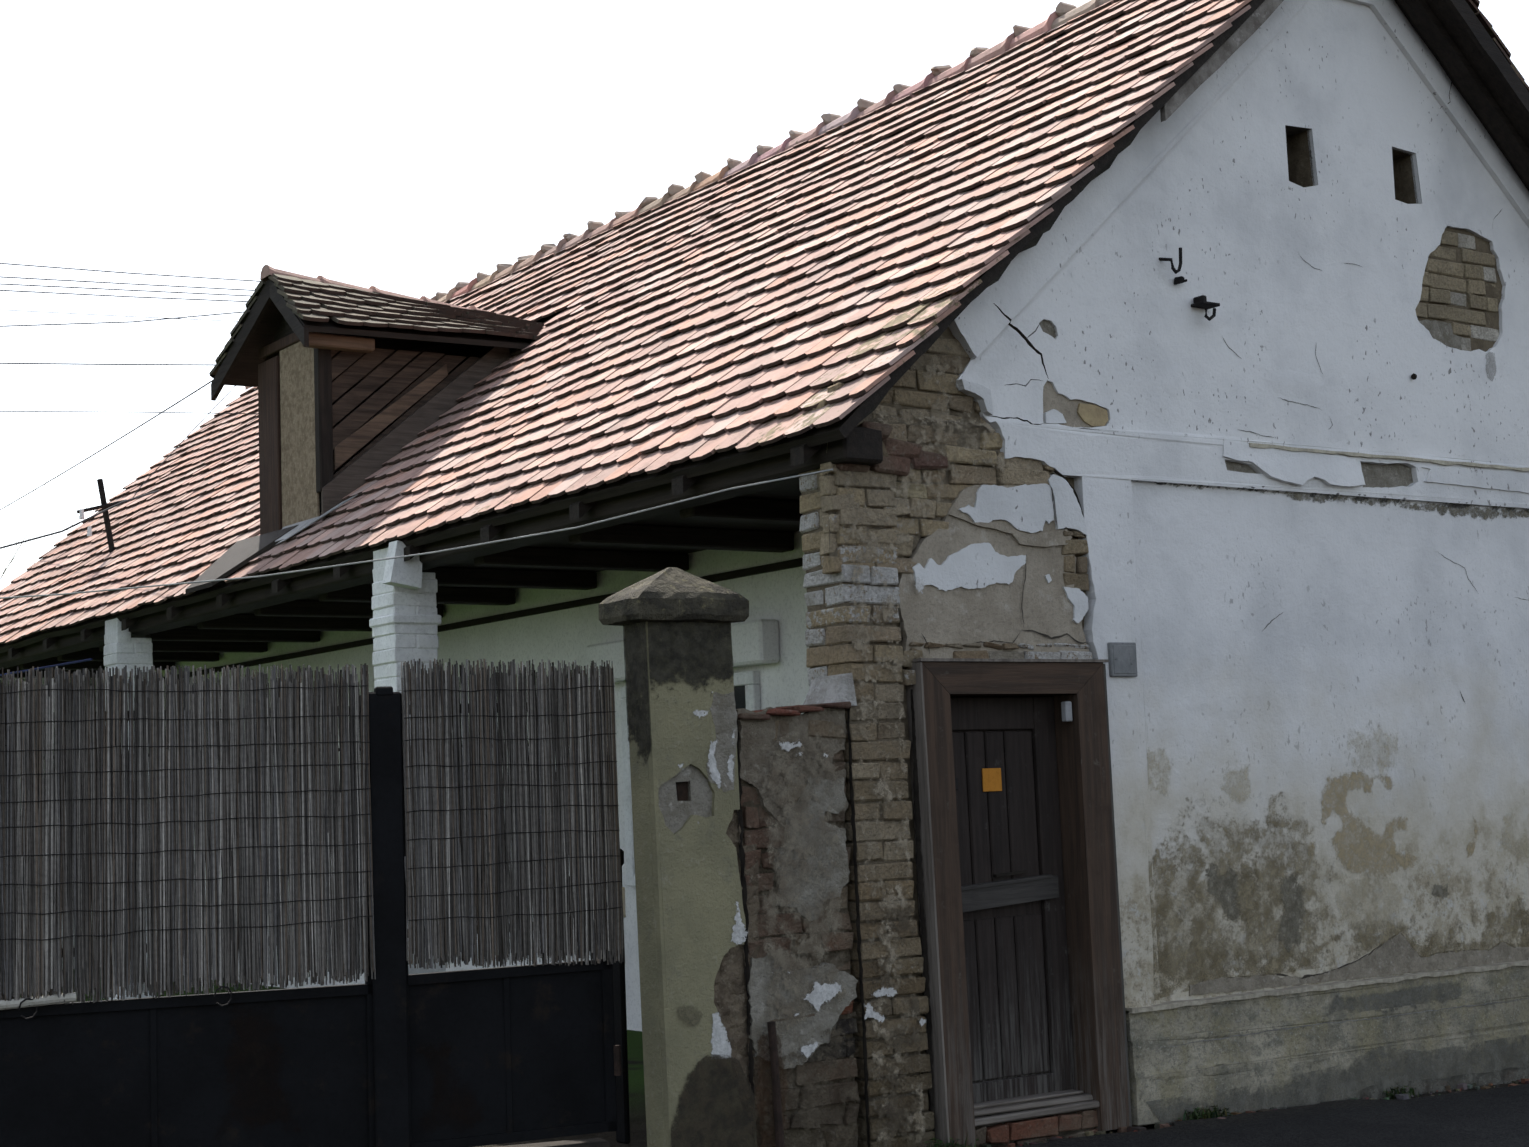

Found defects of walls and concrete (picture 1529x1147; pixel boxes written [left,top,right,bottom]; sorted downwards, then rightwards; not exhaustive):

crack [992,304,1049,425]
flaking render [1040,320,1056,339]
flaking render [1043,382,1108,428]
flaking render [1415,230,1499,351]
flaking render [1222,441,1529,494]
flaking render [658,338,1092,1147]
leakage [1148,770,1529,1000]
leakage [1330,984,1461,1013]
leakage [1146,1035,1529,1125]